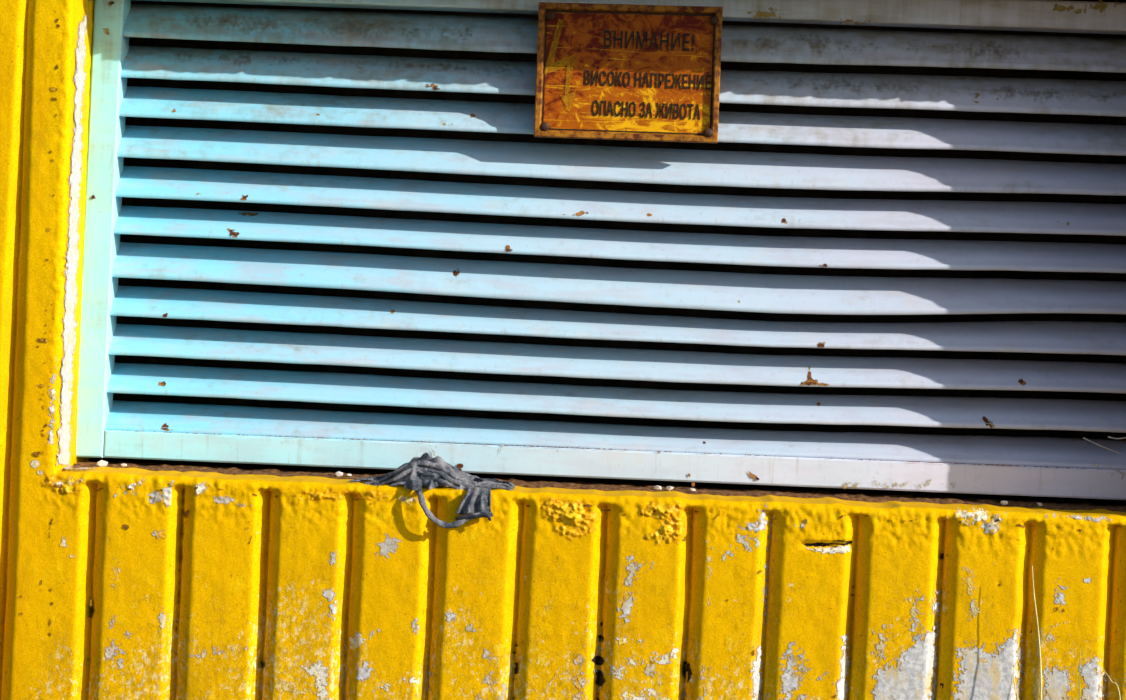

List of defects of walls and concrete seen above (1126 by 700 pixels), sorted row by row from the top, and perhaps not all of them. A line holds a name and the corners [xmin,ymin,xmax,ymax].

peeling [31,16,102,492]
rust [800,366,829,386]
peeling [114,478,257,508]
peeling [706,505,776,579]
peeling [609,555,712,700]
peeling [750,634,851,700]
peeling [871,590,942,700]
peeling [963,567,980,621]
peeling [951,627,1126,700]
peeling [1054,578,1068,612]